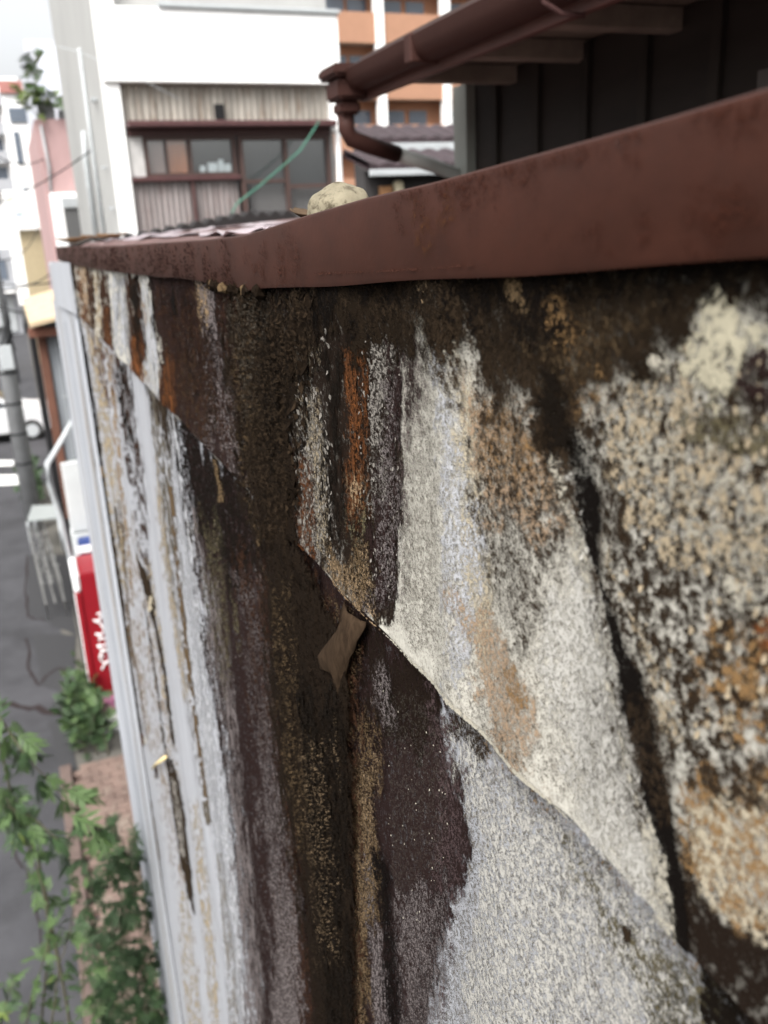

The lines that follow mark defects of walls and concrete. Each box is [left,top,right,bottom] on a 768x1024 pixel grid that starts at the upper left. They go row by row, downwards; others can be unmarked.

corrosion [226,290,380,715]
water stain [59,257,768,1024]
crack [533,368,689,954]